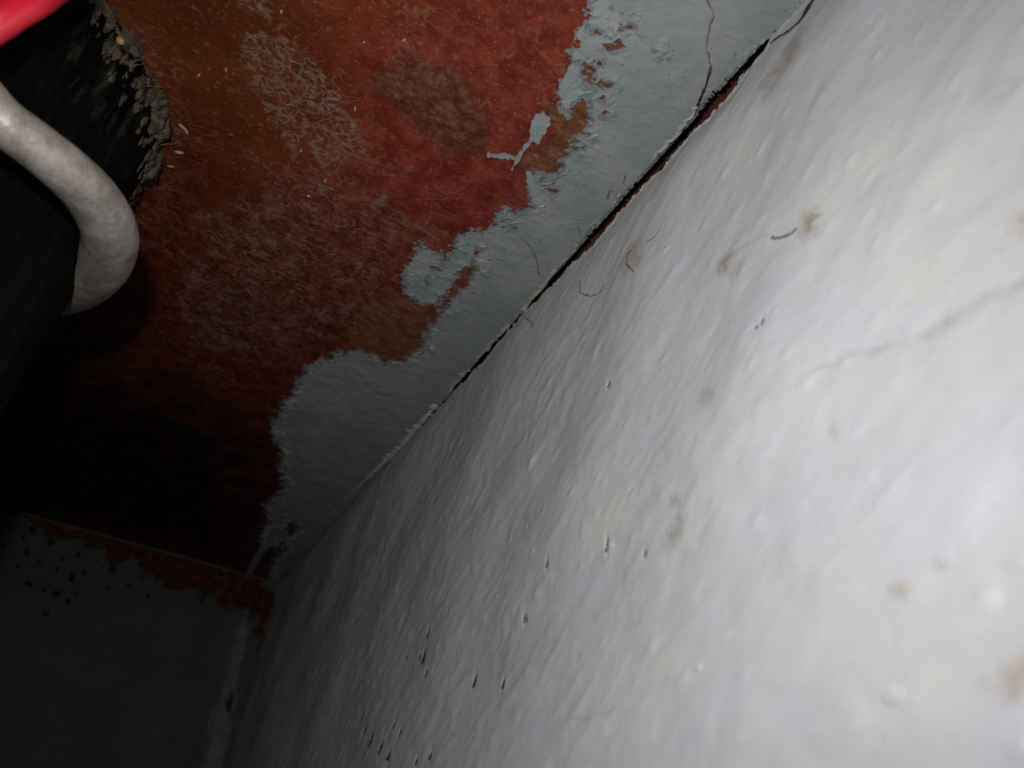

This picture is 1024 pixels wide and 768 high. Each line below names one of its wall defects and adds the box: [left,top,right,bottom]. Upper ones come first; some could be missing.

peeling [246,0,805,583]
crack [323,0,813,536]